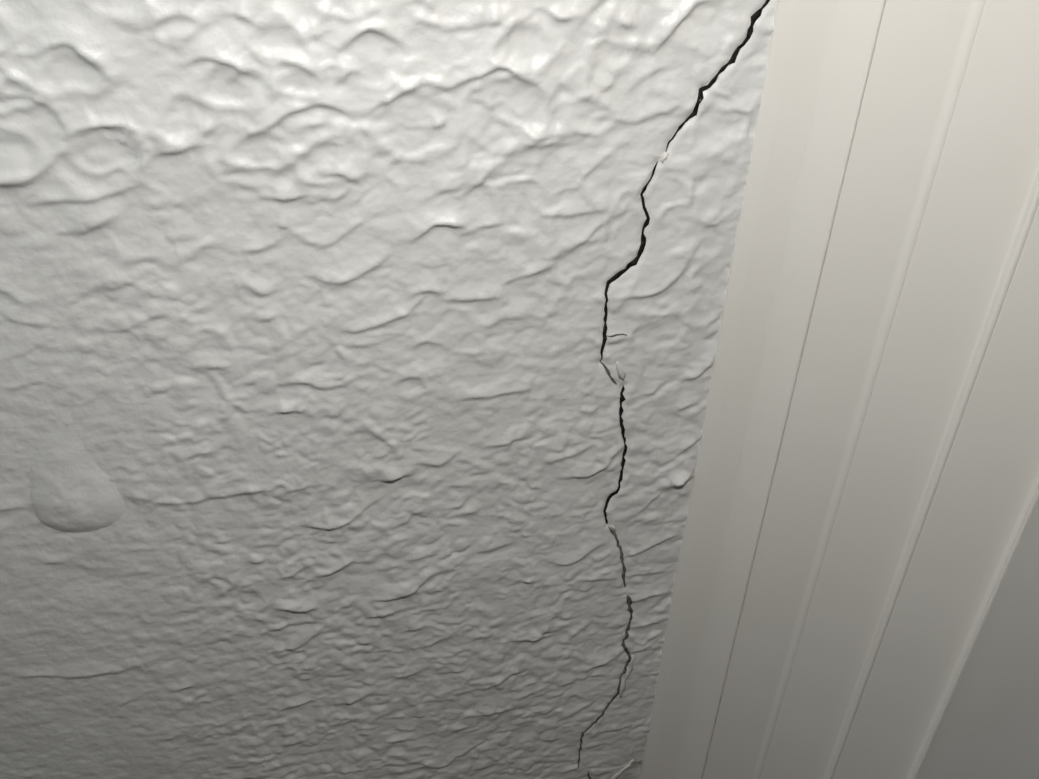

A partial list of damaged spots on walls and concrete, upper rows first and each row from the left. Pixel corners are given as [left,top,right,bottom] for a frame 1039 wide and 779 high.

crack [578,0,770,779]